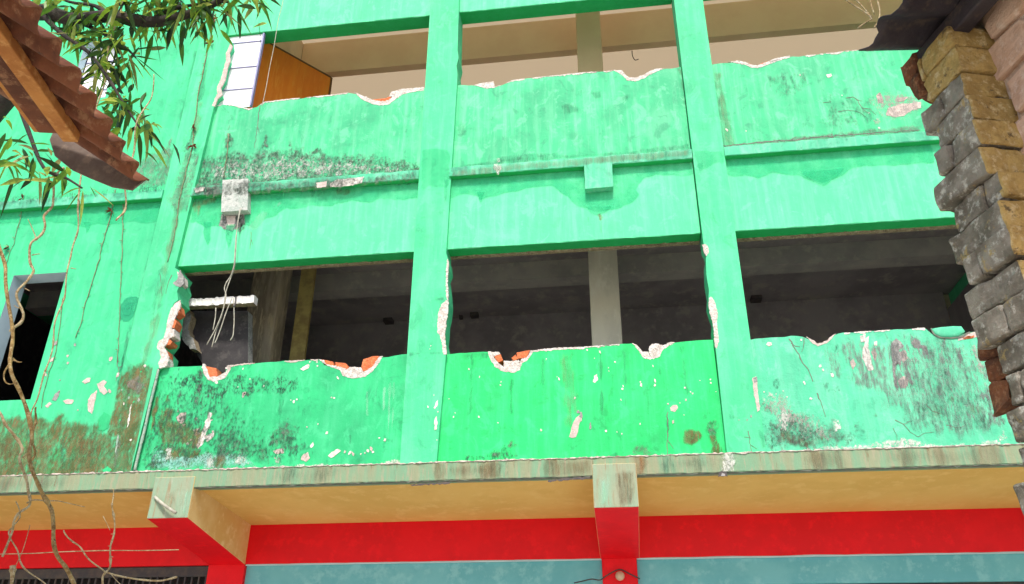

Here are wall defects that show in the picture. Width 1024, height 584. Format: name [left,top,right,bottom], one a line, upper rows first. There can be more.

spalling [869,52,933,129]
leakage [173,133,419,207]
flaking render [45,259,413,453]
spalling [430,241,709,355]
flaking render [487,342,675,387]
flaking render [708,297,719,348]
crack [789,339,826,417]
leakage [145,372,327,470]
peeling [328,437,386,458]
peeling [569,397,591,438]